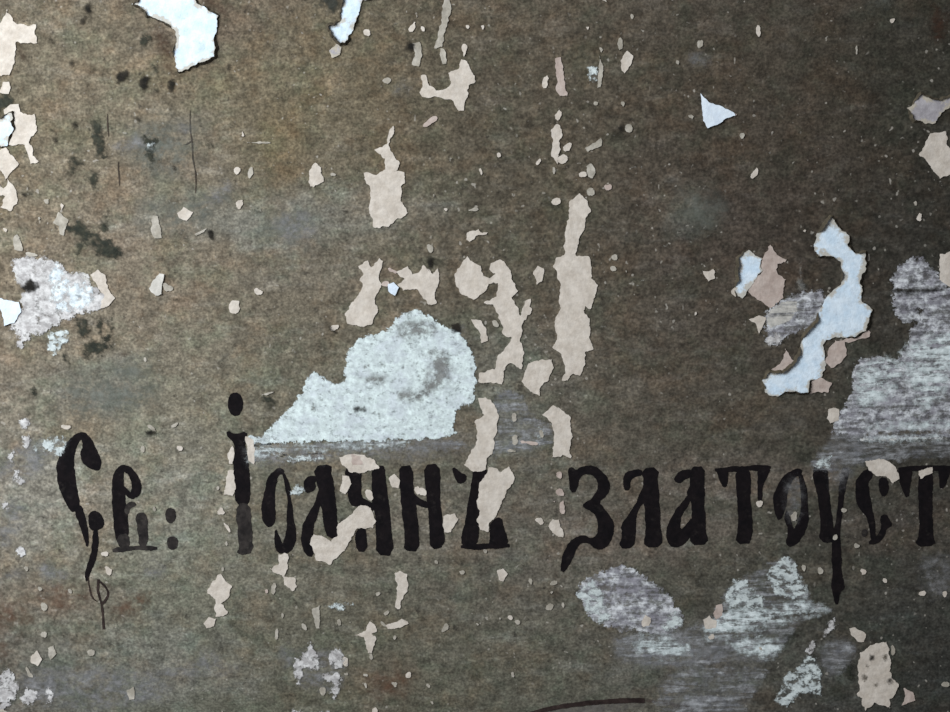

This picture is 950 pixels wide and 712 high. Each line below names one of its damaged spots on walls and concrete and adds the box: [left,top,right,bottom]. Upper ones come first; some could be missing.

peeling [131,0,220,74]
peeling [326,0,371,58]
peeling [536,110,572,174]
peeling [364,126,408,228]
peeling [0,298,21,326]
spalling [22,279,39,292]
peeling [454,164,612,396]
peeling [731,215,873,396]
flaking render [939,251,950,287]
peeling [703,604,723,639]
peeling [849,627,915,711]